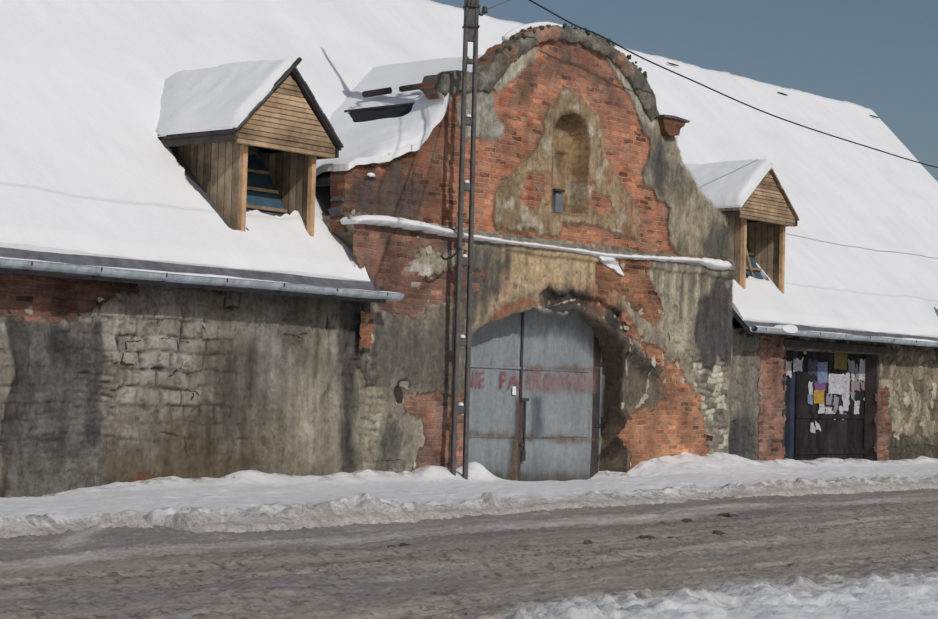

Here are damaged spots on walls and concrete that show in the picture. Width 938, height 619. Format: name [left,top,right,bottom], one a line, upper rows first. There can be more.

flaking render [0,273,140,325]
flaking render [350,210,485,350]
flaking render [537,258,713,473]
leakage [695,269,736,372]
flaking render [394,381,464,471]